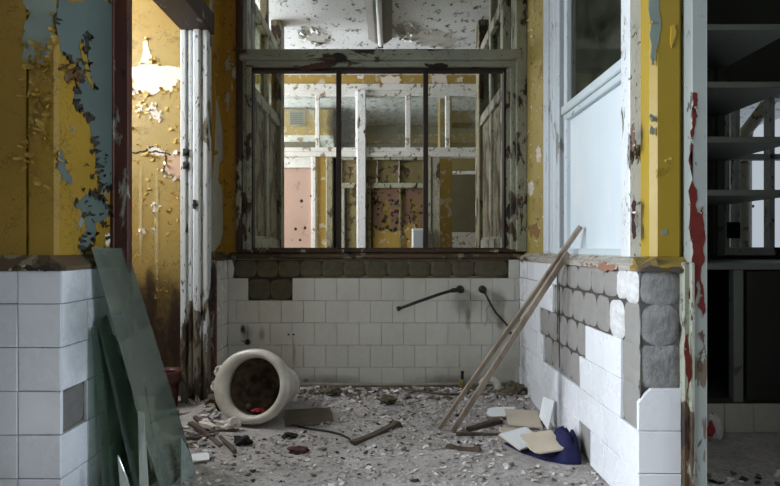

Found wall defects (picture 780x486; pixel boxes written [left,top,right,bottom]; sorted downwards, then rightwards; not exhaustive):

peeling [297,27,331,47]
peeling [648,0,677,65]
peeling [12,0,118,254]
peeling [132,36,180,243]
crack [132,146,180,174]
peeling [541,92,707,428]
damp [132,272,180,397]